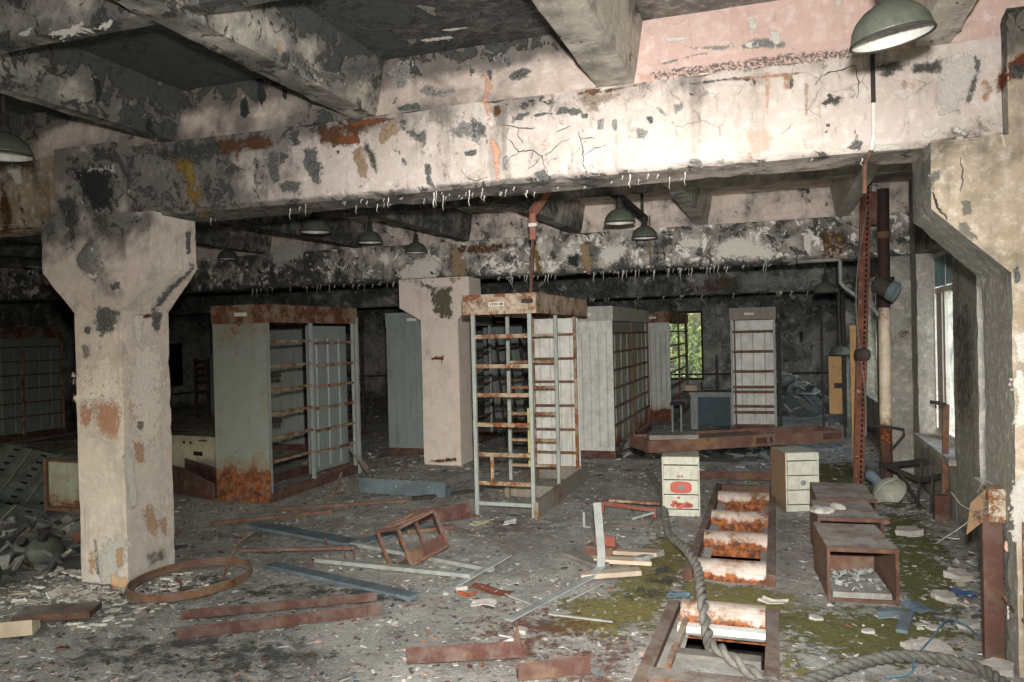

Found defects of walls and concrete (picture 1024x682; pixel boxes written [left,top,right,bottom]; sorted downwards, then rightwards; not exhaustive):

rust [481,72,501,120]
spalling [455,49,531,83]
crack [815,65,860,96]
rust [217,135,273,160]
rust [318,118,393,154]
crack [504,124,604,172]
spalling [66,164,130,215]
leakage [417,243,518,319]
peeling [72,231,198,539]